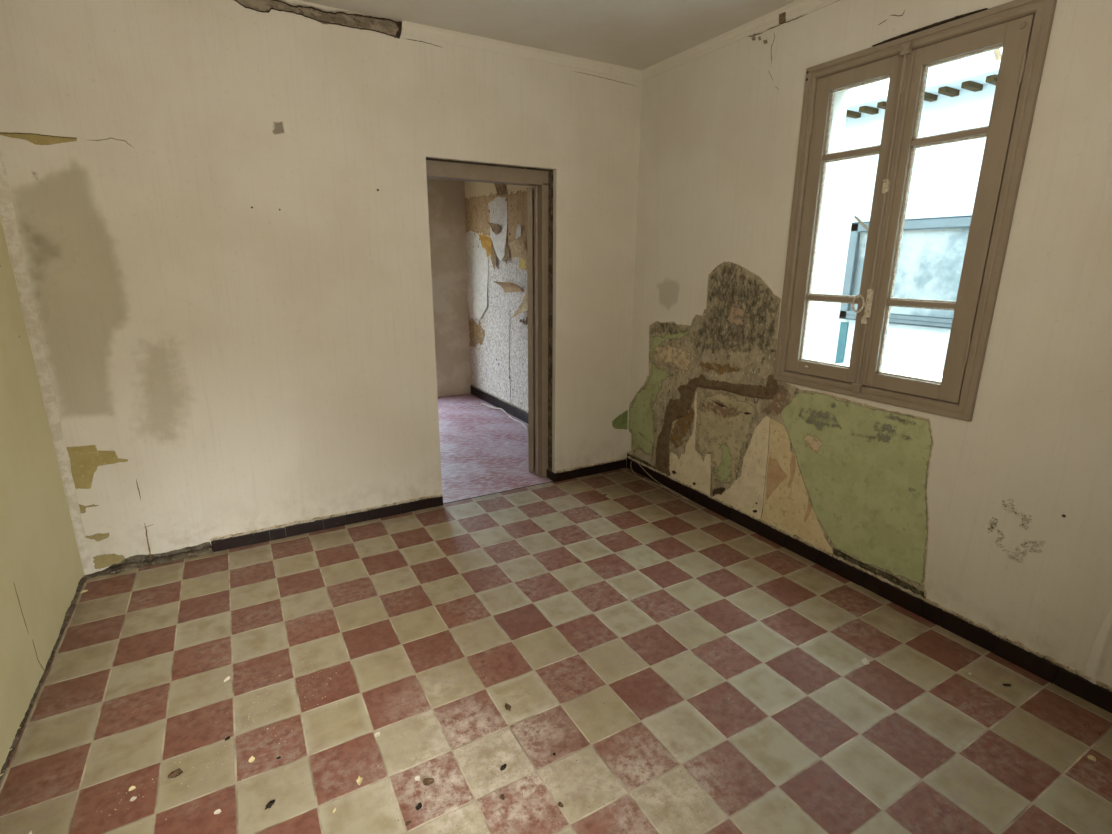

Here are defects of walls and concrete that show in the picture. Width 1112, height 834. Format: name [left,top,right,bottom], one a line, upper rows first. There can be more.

flaking render [234,0,402,39]
crack [748,0,840,90]
peeling [0,132,134,148]
peeling [612,261,934,599]
peeling [66,445,128,489]
peeling [86,533,109,541]
peeling [93,554,125,569]